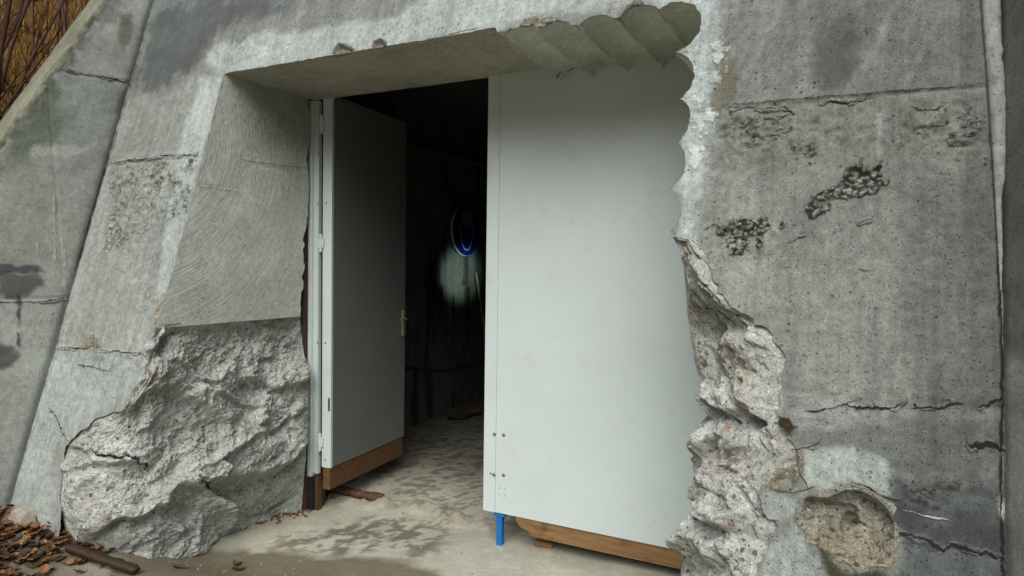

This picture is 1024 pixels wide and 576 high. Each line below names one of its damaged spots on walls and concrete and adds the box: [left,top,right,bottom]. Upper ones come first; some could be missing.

spalling [503,16,562,33]
crack [718,86,984,120]
water stain [0,264,42,319]
water stain [0,333,20,368]
crack [47,408,149,472]
spalling [60,291,311,559]
spalling [665,237,900,576]
rust [777,417,798,432]
crack [806,260,1007,576]